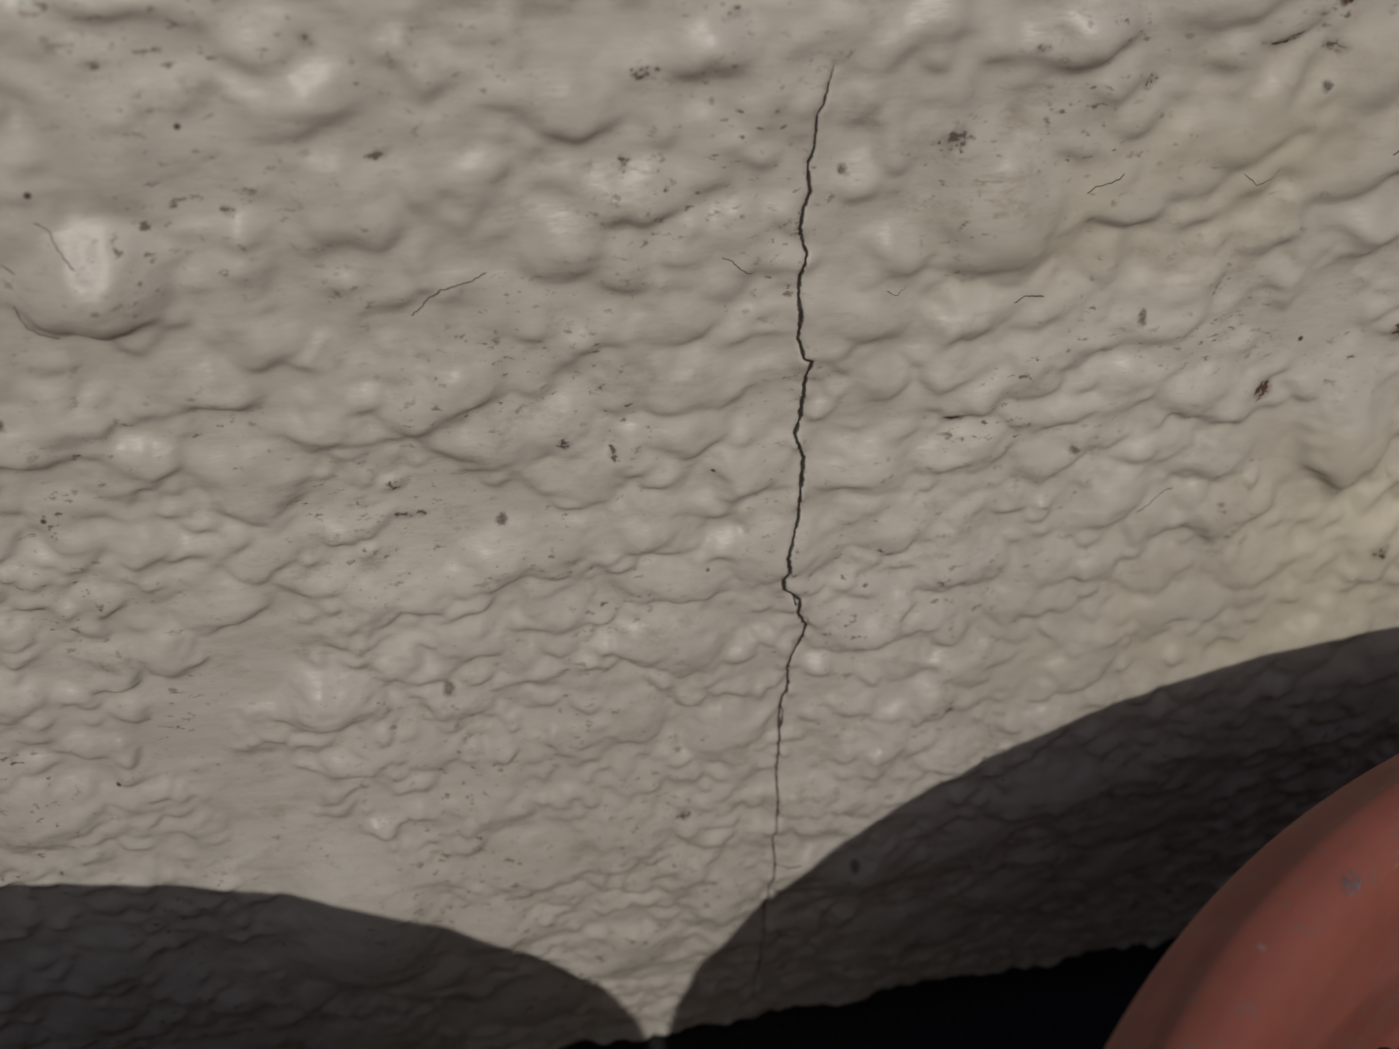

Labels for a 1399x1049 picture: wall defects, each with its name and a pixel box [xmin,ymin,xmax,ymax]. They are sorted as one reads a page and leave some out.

crack [753,65,834,995]